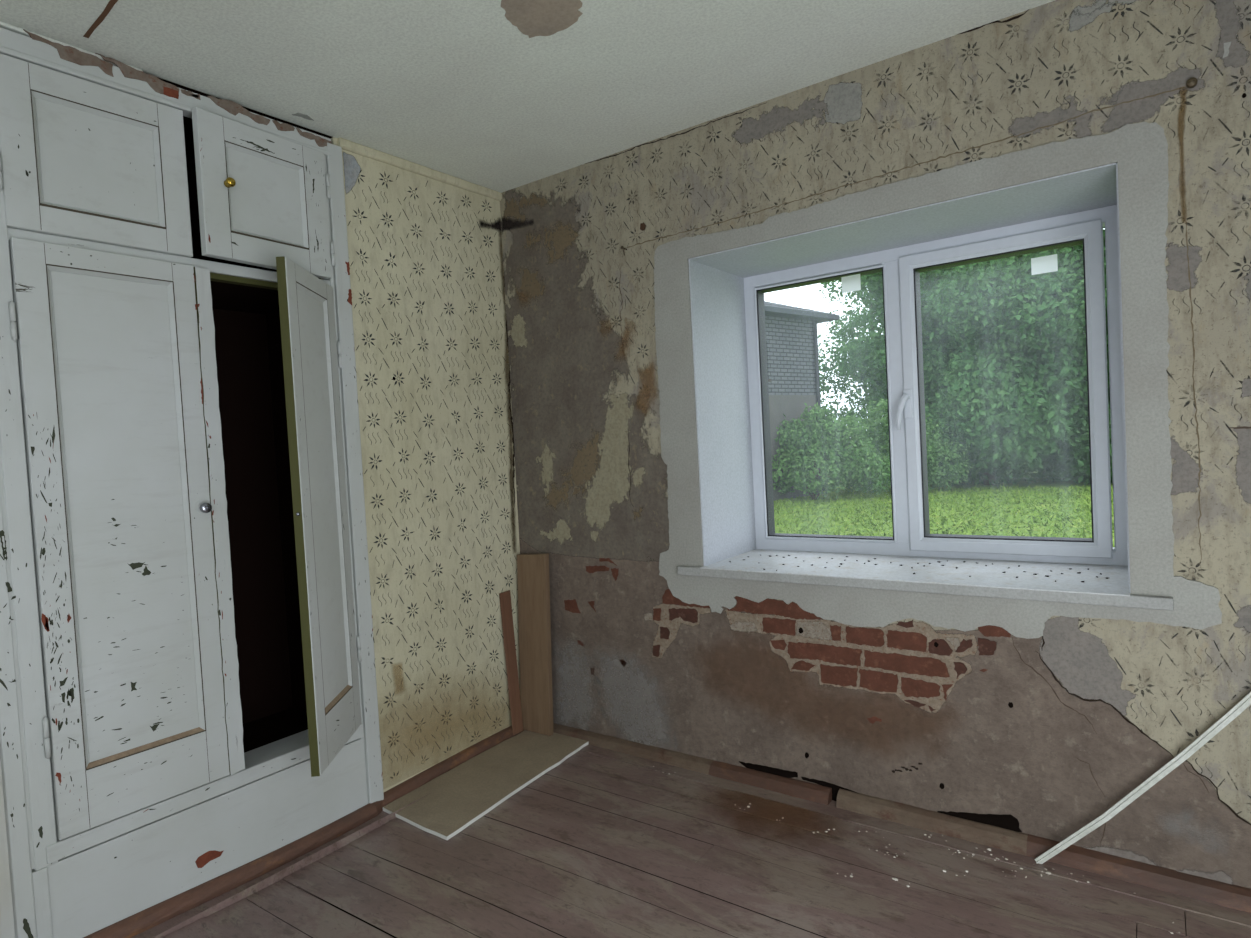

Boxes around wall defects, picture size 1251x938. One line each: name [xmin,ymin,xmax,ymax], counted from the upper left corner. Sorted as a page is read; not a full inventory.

peeling [501,0,583,38]
peeling [1215,0,1250,68]
peeling [732,95,829,144]
peeling [1008,67,1205,138]
flaking render [501,189,1251,889]